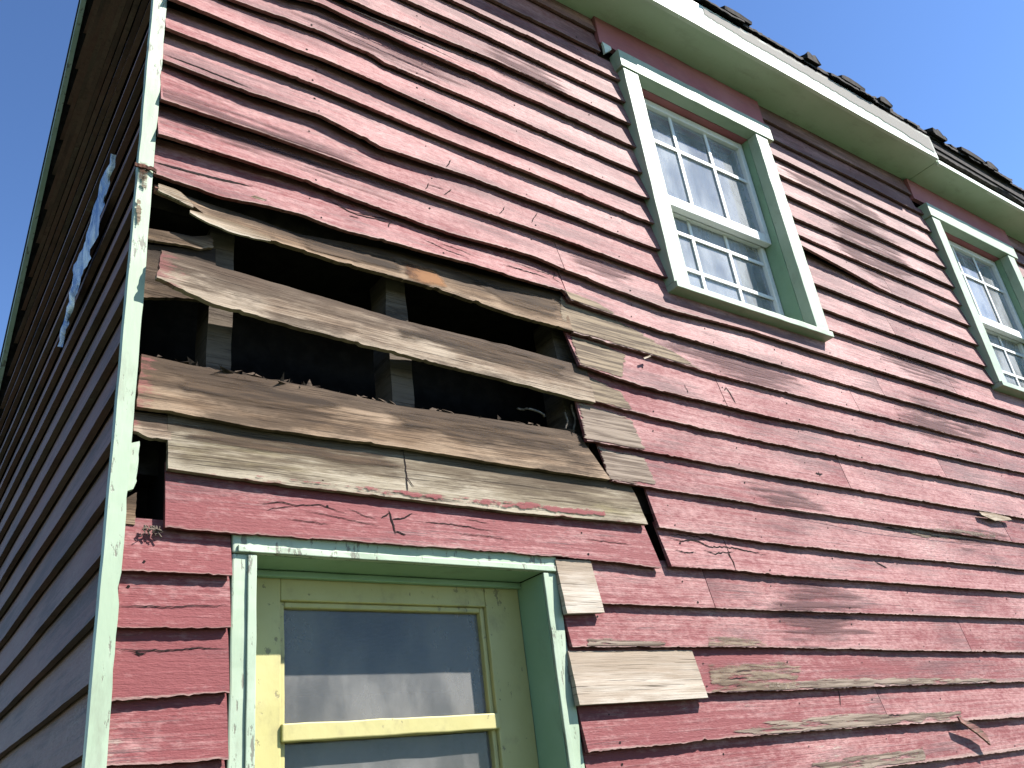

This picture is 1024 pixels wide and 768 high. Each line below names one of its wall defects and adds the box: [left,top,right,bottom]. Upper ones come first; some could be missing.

spalling [110,174,702,484]
spalling [126,442,166,520]
crack [257,450,509,540]
peeling [349,486,605,516]
crack [669,534,765,566]
peeling [708,662,996,692]
peeling [734,711,962,734]